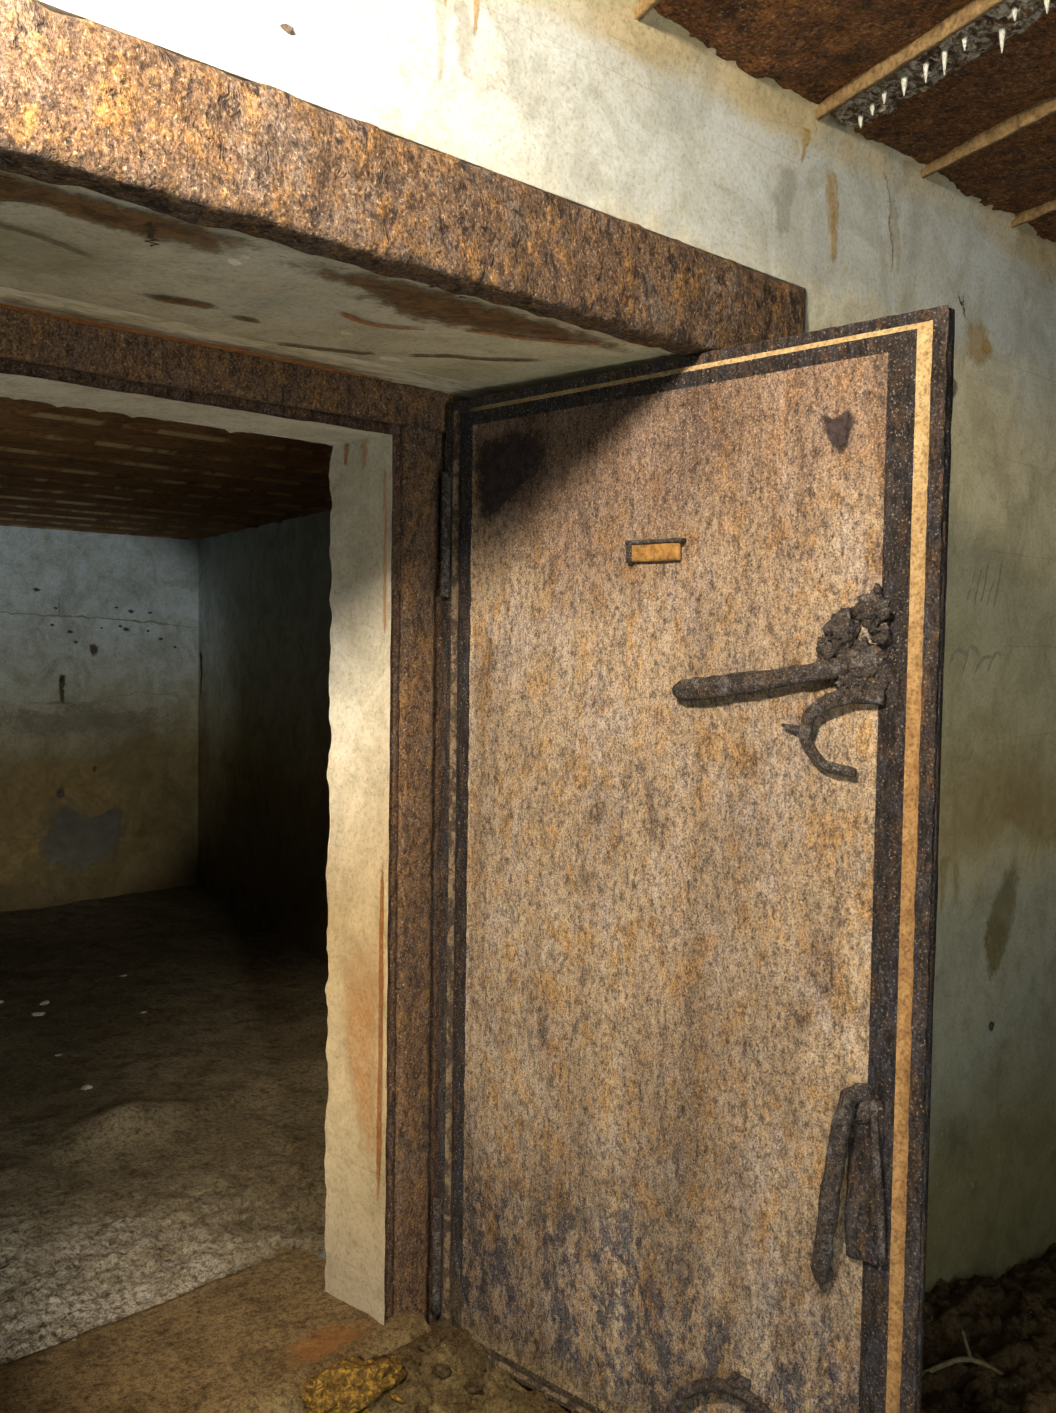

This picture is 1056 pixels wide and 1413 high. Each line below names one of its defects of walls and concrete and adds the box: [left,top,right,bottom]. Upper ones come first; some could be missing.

rust [827,173,838,259]
leakage [986,874,1015,970]